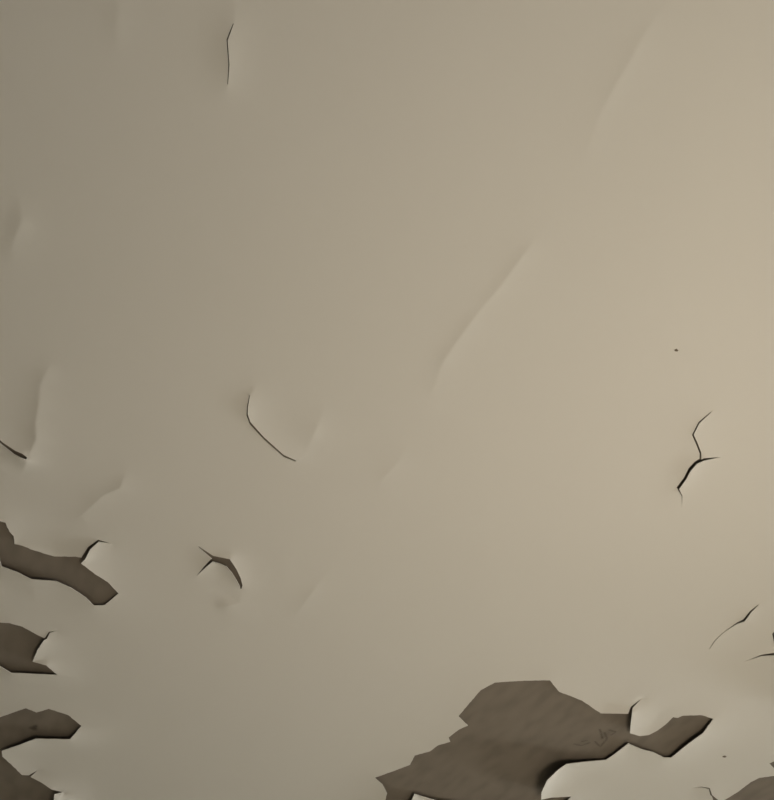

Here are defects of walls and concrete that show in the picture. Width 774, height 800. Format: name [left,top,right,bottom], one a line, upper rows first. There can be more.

crack [662,407,726,513]
peeling [0,502,132,618]
crack [193,543,254,613]
peeling [0,615,83,686]
crack [706,603,774,664]
peeling [0,702,109,800]
peeling [349,671,742,800]
peeling [675,746,774,800]